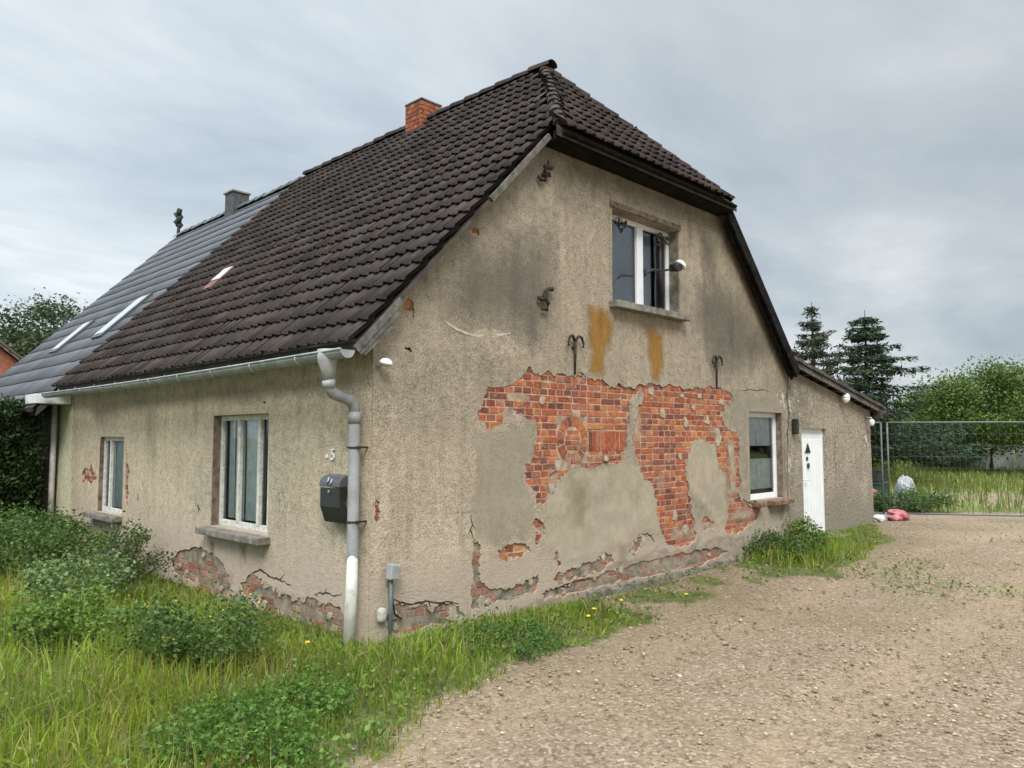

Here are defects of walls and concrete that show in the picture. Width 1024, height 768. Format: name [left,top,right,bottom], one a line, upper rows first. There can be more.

corrosion [590,309,612,373]
corrosion [648,331,662,378]
spalling [83,465,97,484]
spalling [386,367,759,635]
spalling [173,547,344,635]
crack [251,569,291,586]